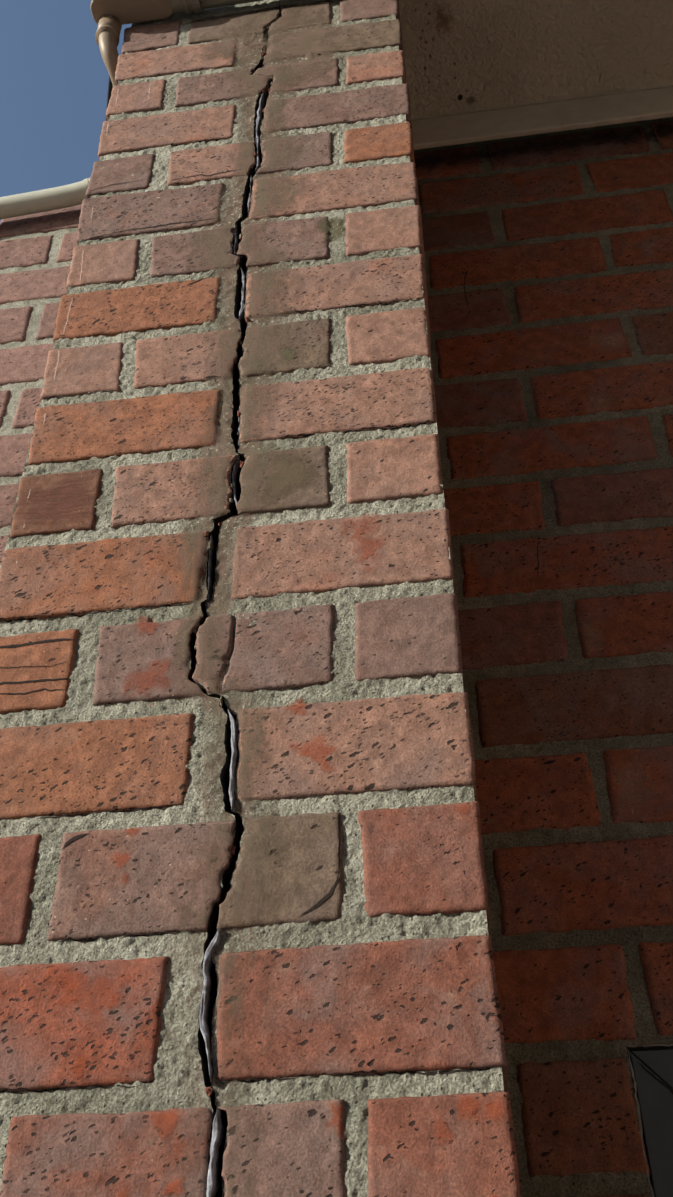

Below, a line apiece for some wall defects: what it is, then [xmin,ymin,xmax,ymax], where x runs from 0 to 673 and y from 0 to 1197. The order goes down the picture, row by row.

crack [344,299,422,308]
crack [281,421,434,439]
crack [0,2,294,1197]
crack [297,810,342,918]
crack [331,1067,495,1076]